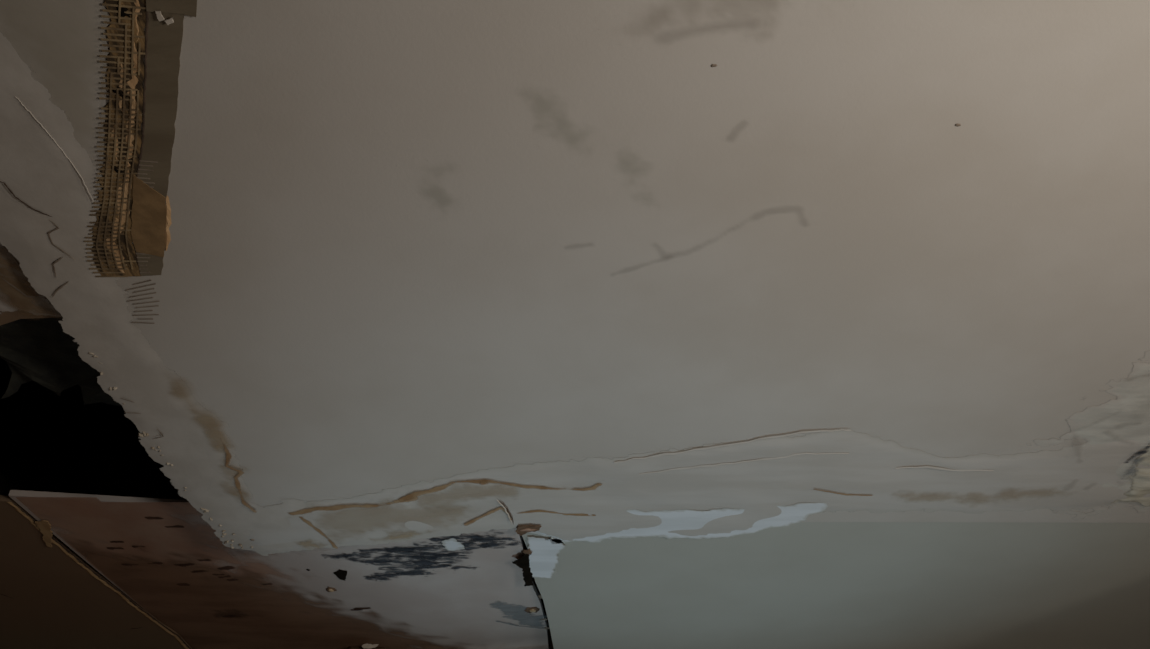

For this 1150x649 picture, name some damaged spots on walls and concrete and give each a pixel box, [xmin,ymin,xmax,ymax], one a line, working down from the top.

peeling [155,11,174,25]
crack [497,500,514,525]
leakage [325,532,520,581]
leakage [16,497,457,649]
leakage [490,601,544,629]